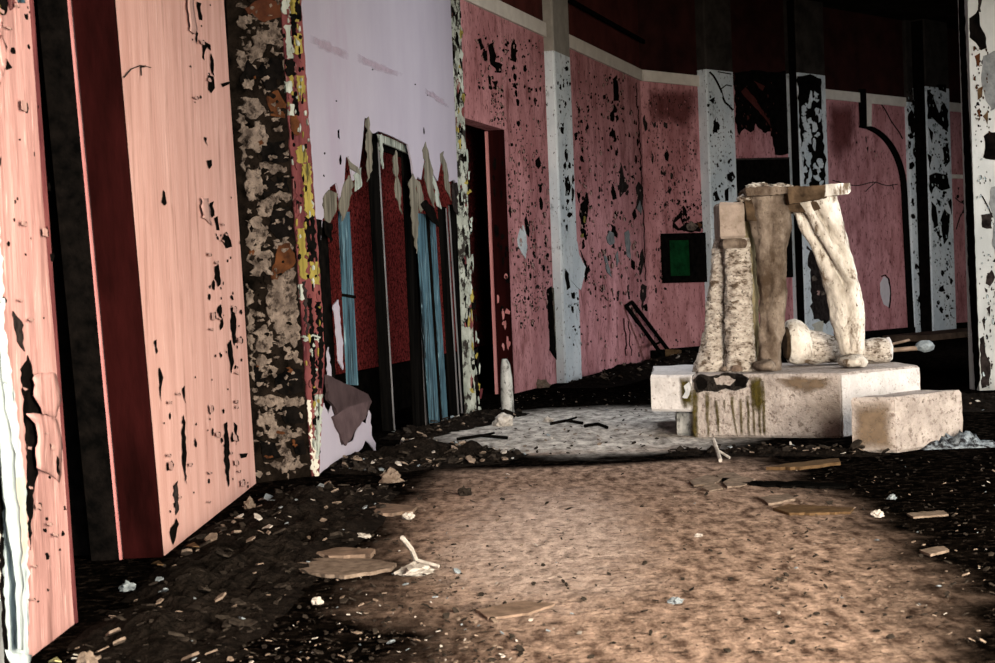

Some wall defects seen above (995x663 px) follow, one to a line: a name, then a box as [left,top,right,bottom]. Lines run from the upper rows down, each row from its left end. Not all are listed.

peeling [0,0,30,84]
peeling [0,230,65,663]
peeling [159,368,197,544]
flaking render [188,0,483,488]
flaking render [475,34,557,360]
peeling [557,0,830,357]
spalling [682,372,749,398]
water stain [684,381,766,437]
flaking render [907,0,995,390]